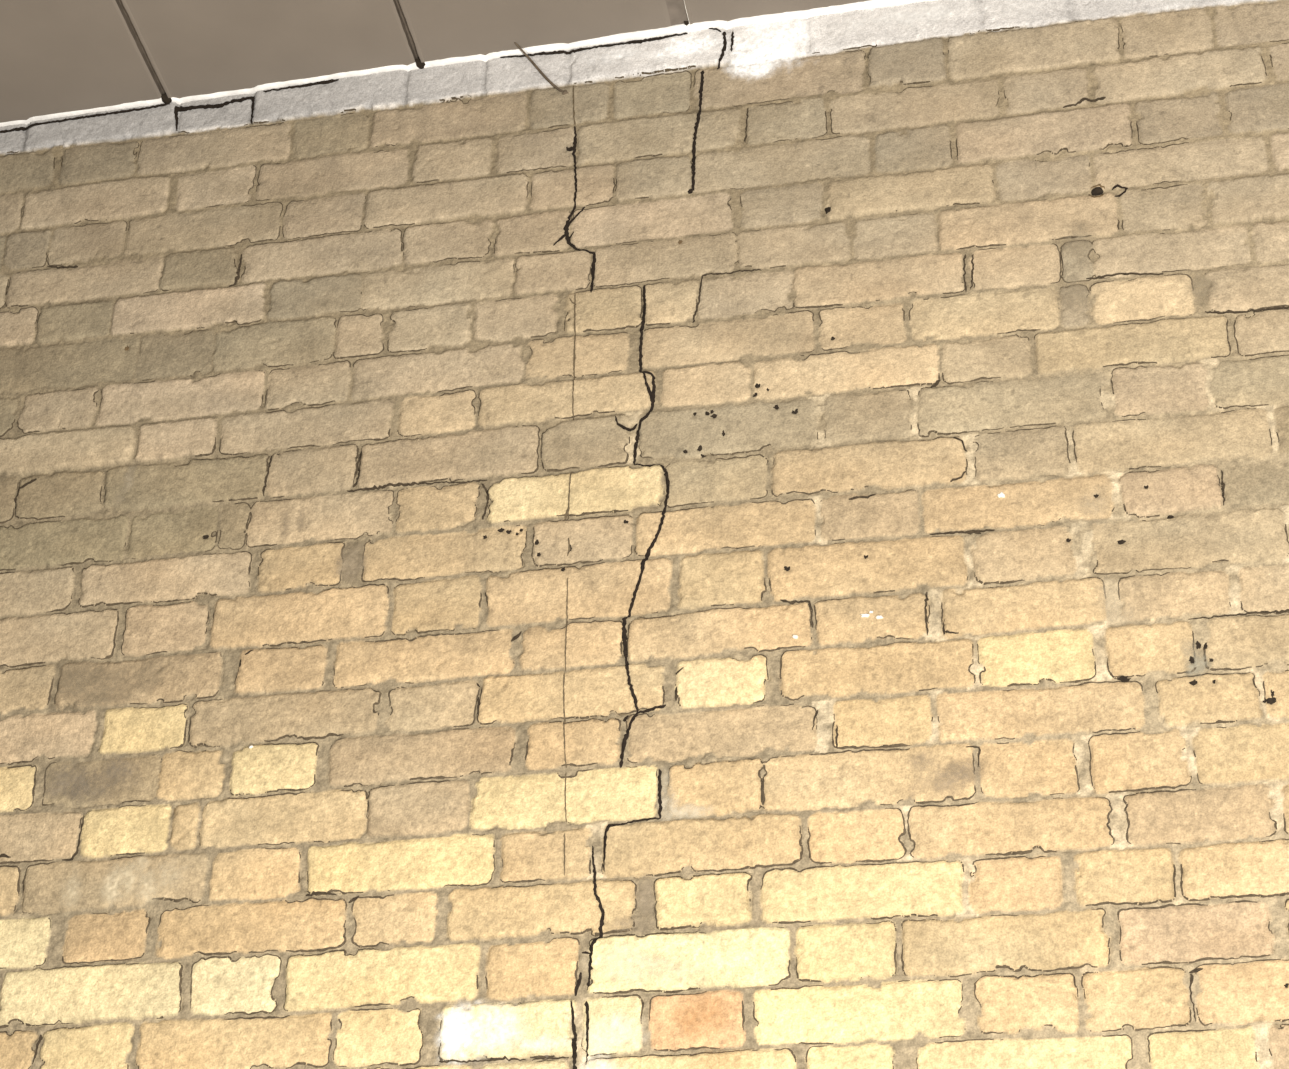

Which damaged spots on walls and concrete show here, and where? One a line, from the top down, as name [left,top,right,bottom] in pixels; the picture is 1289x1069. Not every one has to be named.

crack [0,79,339,133]
crack [553,86,596,420]
crack [500,28,734,194]
crack [615,285,670,768]
crack [563,472,663,1069]